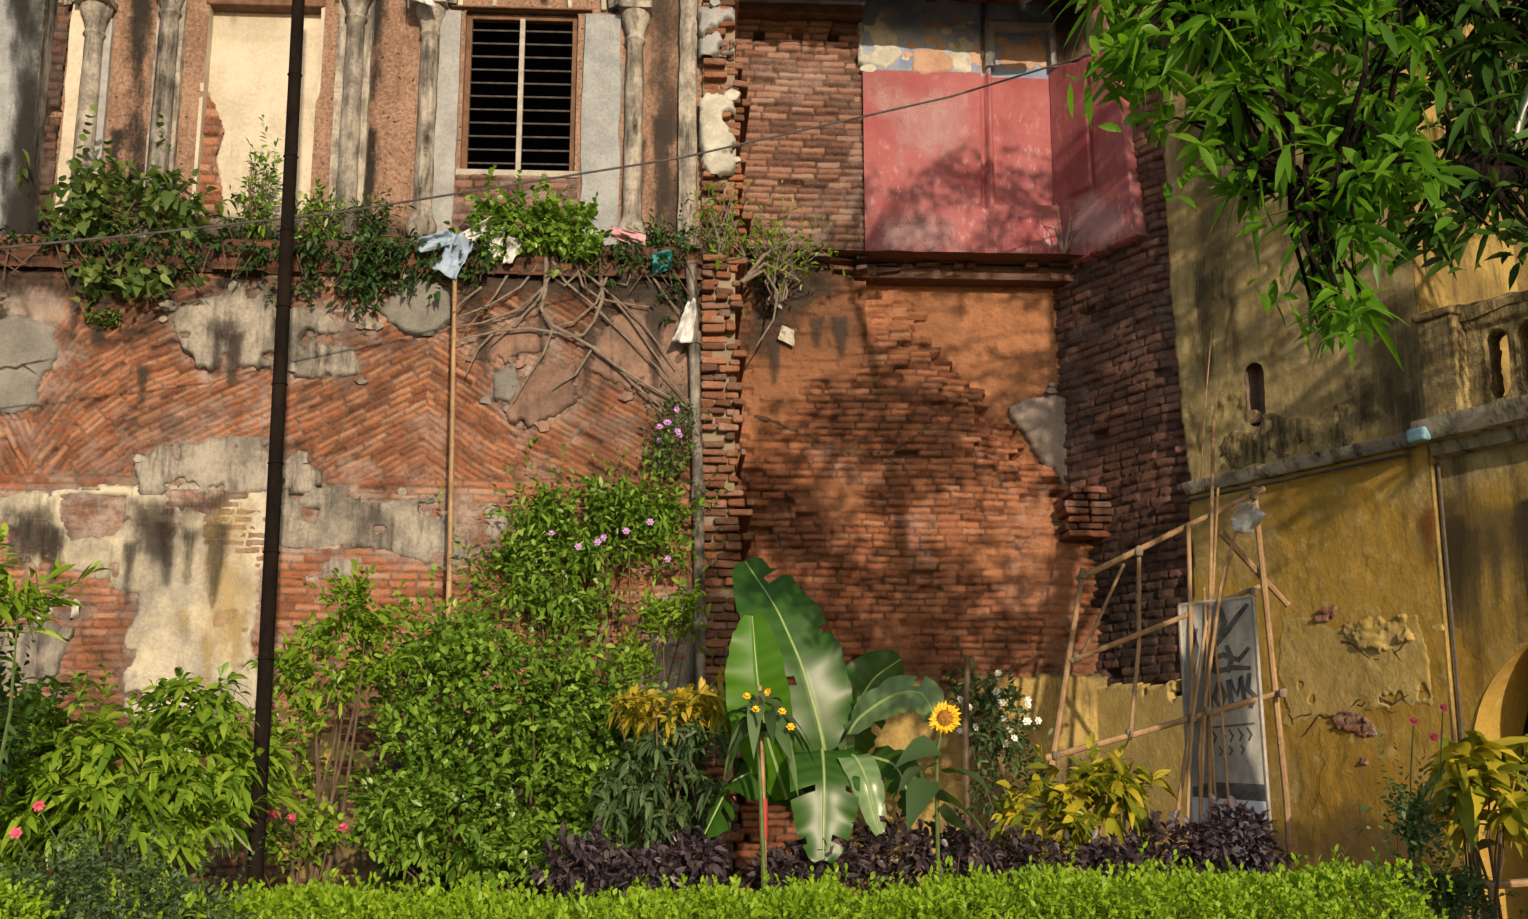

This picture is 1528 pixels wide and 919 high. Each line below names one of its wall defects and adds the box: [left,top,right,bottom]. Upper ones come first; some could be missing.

peeling [857,12,1048,76]
peeling [724,88,741,103]
water stain [0,0,40,235]
peeling [157,299,179,323]
peeling [356,298,384,332]
crack [0,358,57,374]
peeling [293,451,309,464]
water stain [7,507,63,576]
water stain [124,495,246,690]
water stain [1444,499,1528,656]
spalling [1314,604,1337,624]
spalling [1332,710,1377,738]